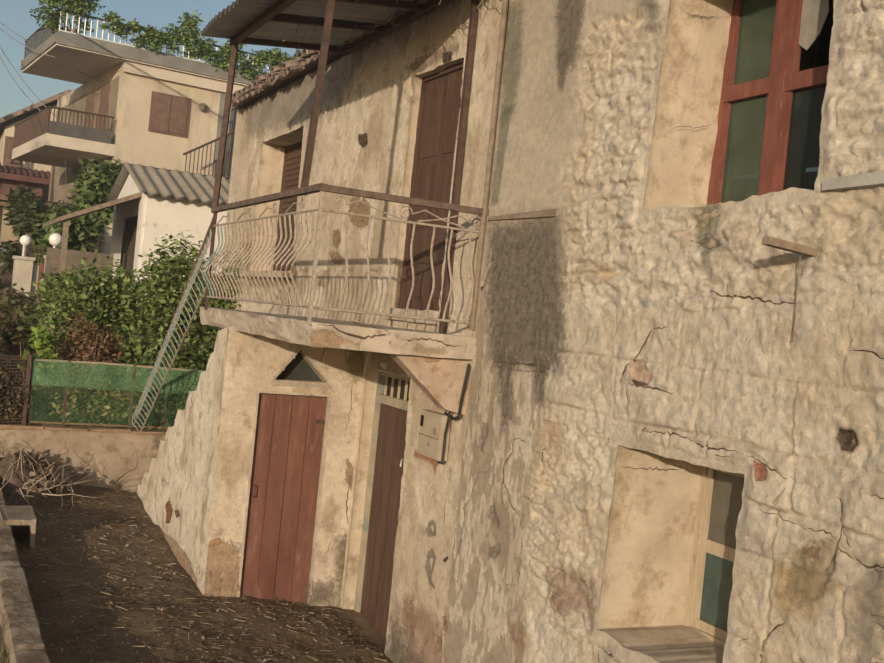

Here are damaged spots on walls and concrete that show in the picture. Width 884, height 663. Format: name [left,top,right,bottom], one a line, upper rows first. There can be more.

crack [318,320,462,347]
water stain [486,218,565,426]
crack [620,327,679,415]
spalling [165,501,180,523]
peeling [426,520,436,537]
crack [444,438,545,576]
crack [639,428,884,572]
peeling [164,534,241,597]
peeling [425,548,448,588]